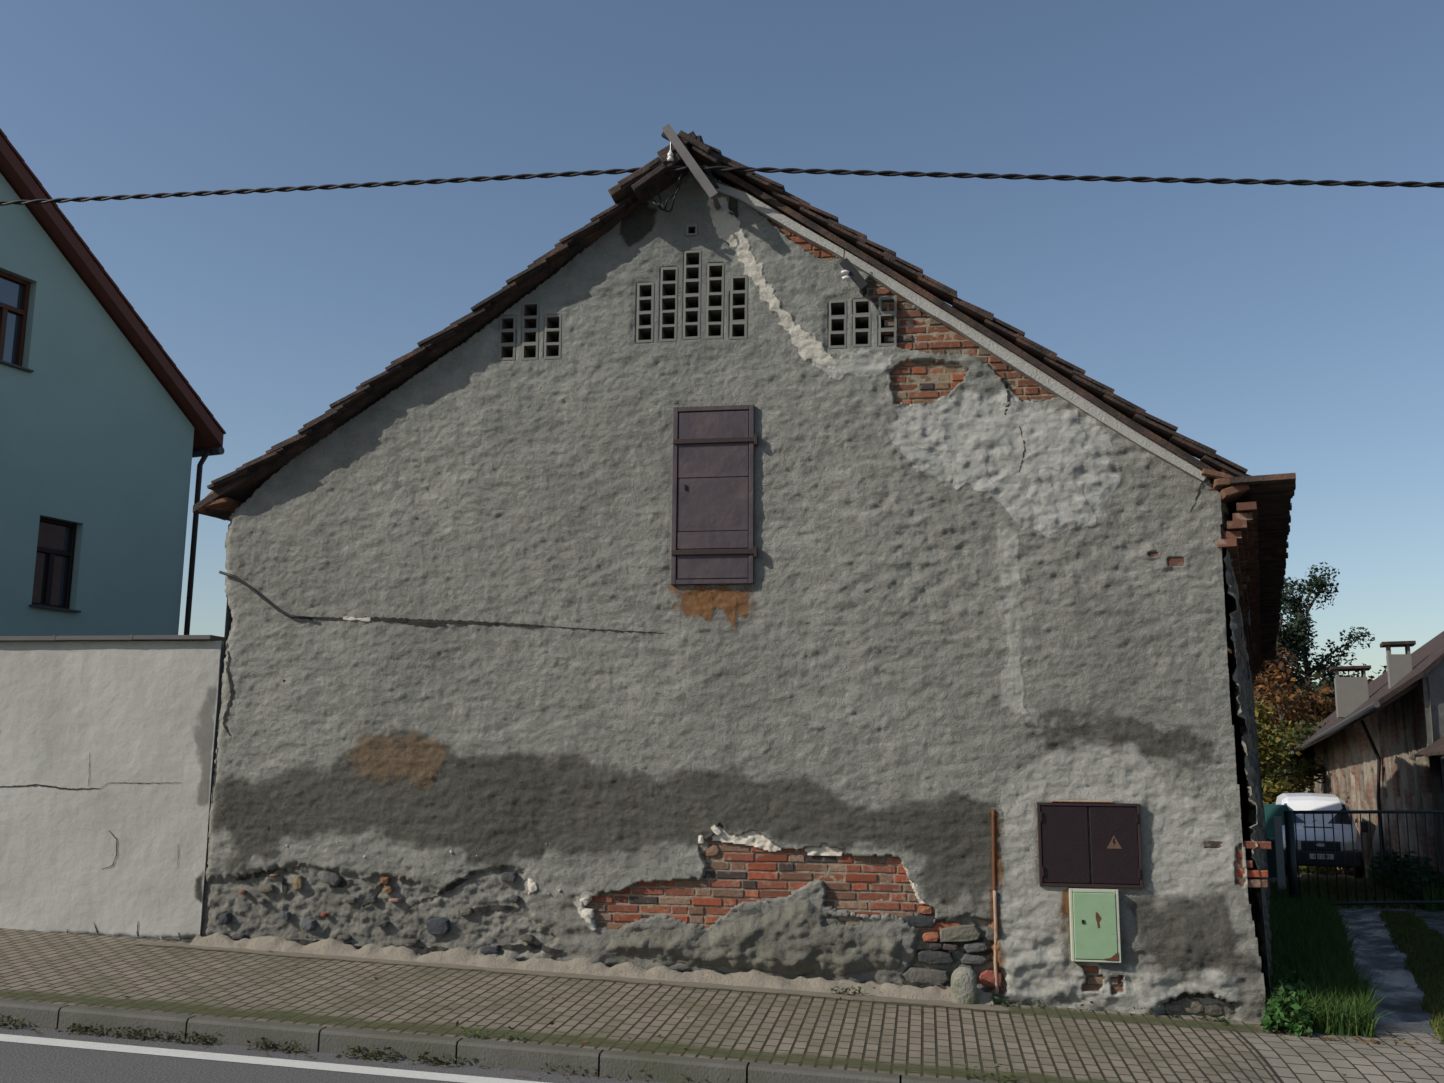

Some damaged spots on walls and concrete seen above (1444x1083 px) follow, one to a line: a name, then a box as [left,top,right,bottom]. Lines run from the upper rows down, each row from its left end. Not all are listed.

peeling [860,279,1120,538]
crack [0,643,234,802]
water stain [195,688,992,903]
flaking render [161,881,246,941]
flaking render [231,824,1005,995]